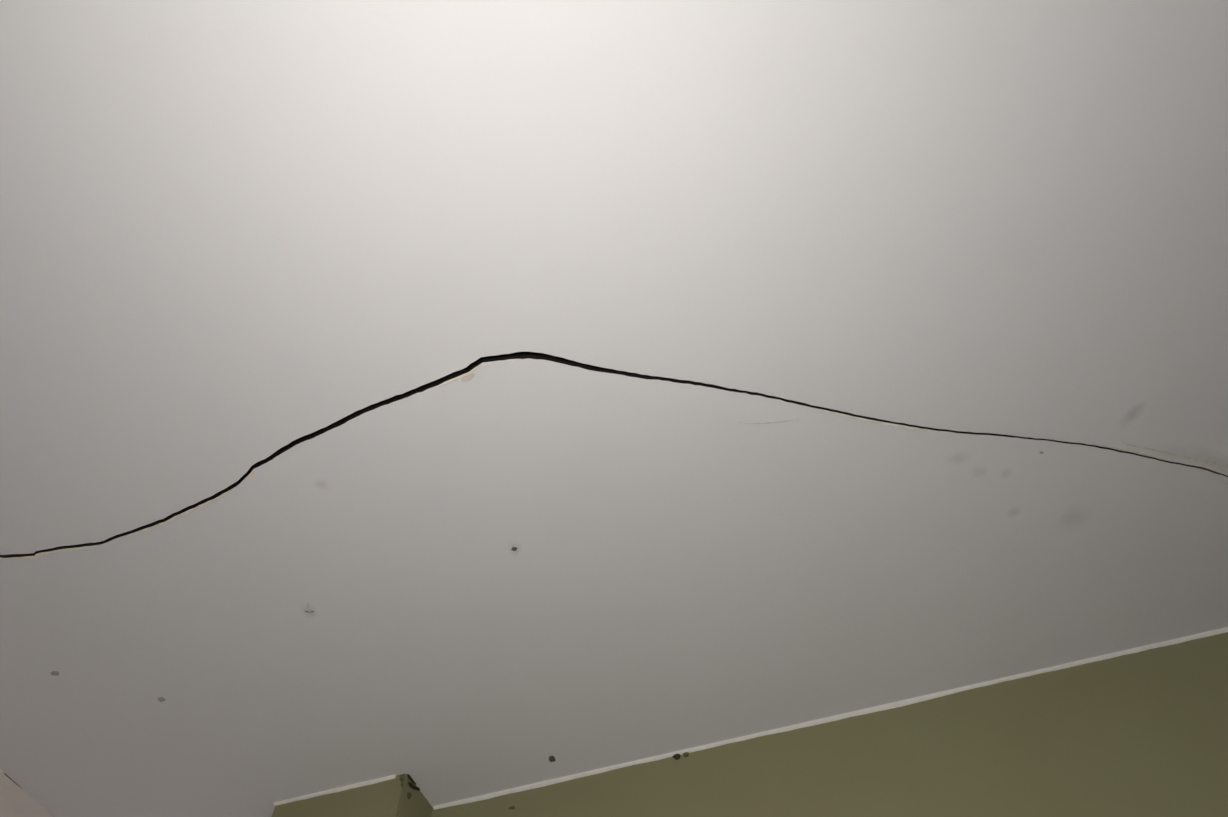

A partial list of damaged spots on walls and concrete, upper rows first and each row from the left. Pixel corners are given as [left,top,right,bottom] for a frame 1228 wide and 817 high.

crack [0,352,1228,560]